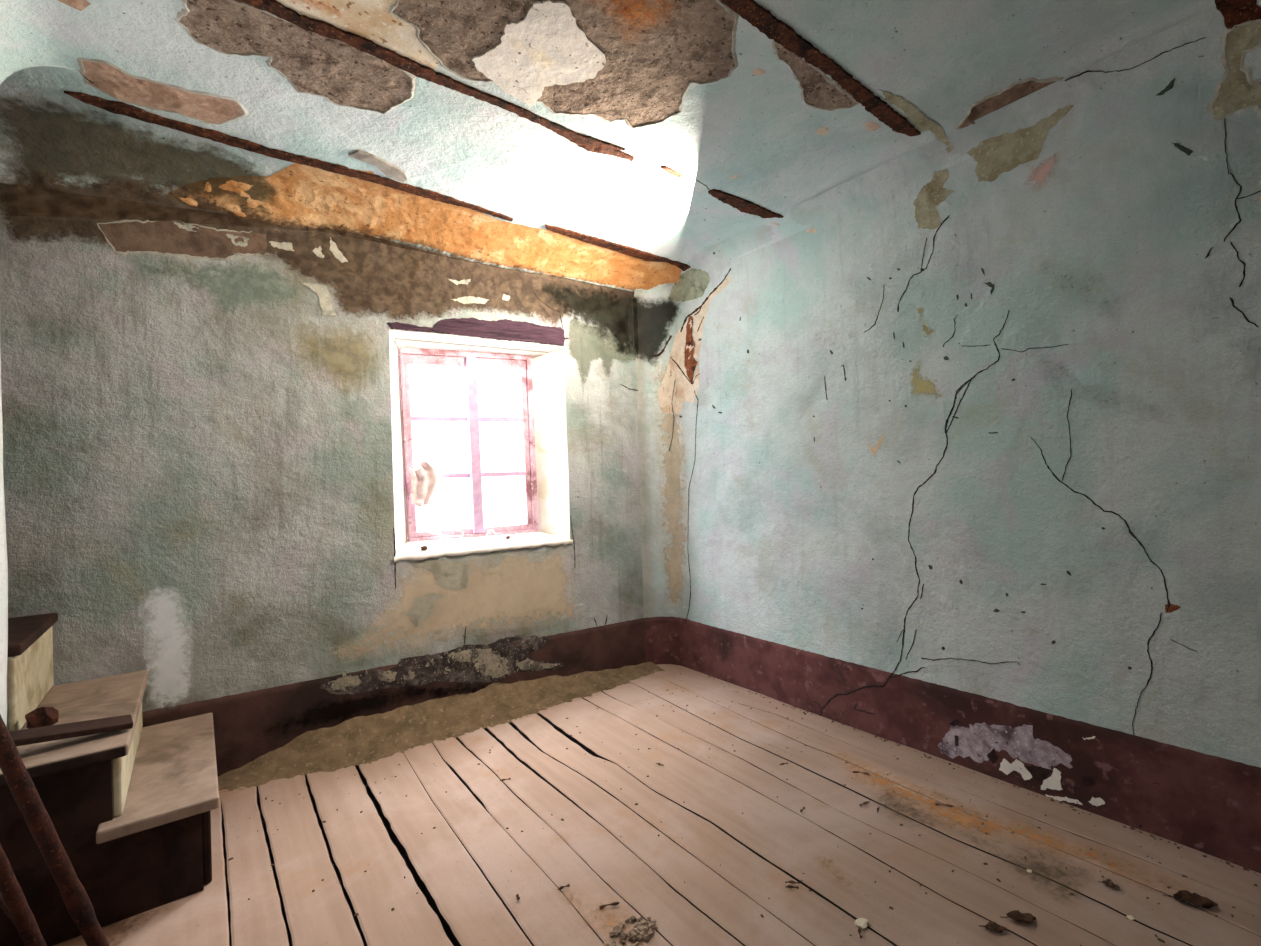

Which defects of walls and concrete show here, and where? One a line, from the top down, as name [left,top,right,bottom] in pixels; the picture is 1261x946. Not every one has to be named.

spalling [77,58,248,125]
spalling [174,0,739,128]
spalling [771,40,859,111]
peeling [881,76,1074,182]
spalling [1206,19,1261,120]
leakage [0,98,678,381]
crack [1205,119,1261,327]
leakage [299,333,370,391]
spalling [320,560,566,695]
leakage [353,557,572,650]
crack [814,310,1068,716]
crack [1030,389,1170,735]